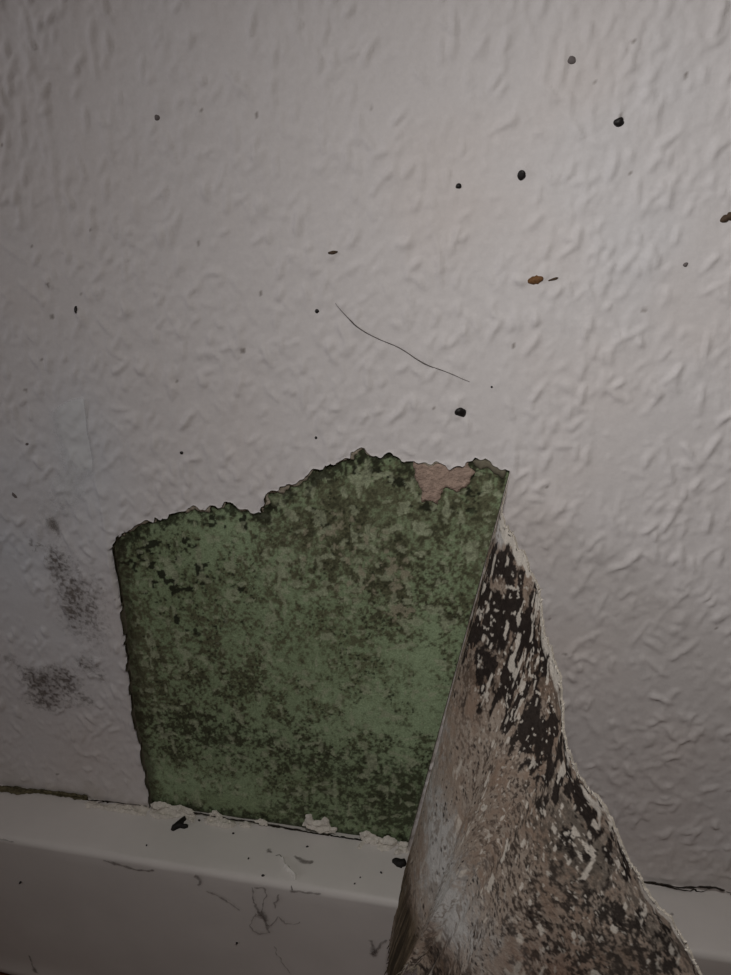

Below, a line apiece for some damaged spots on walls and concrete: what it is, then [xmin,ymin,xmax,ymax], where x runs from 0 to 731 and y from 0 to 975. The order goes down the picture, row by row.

water stain [50,552,95,628]
water stain [25,670,74,707]
peeling [84,447,509,855]